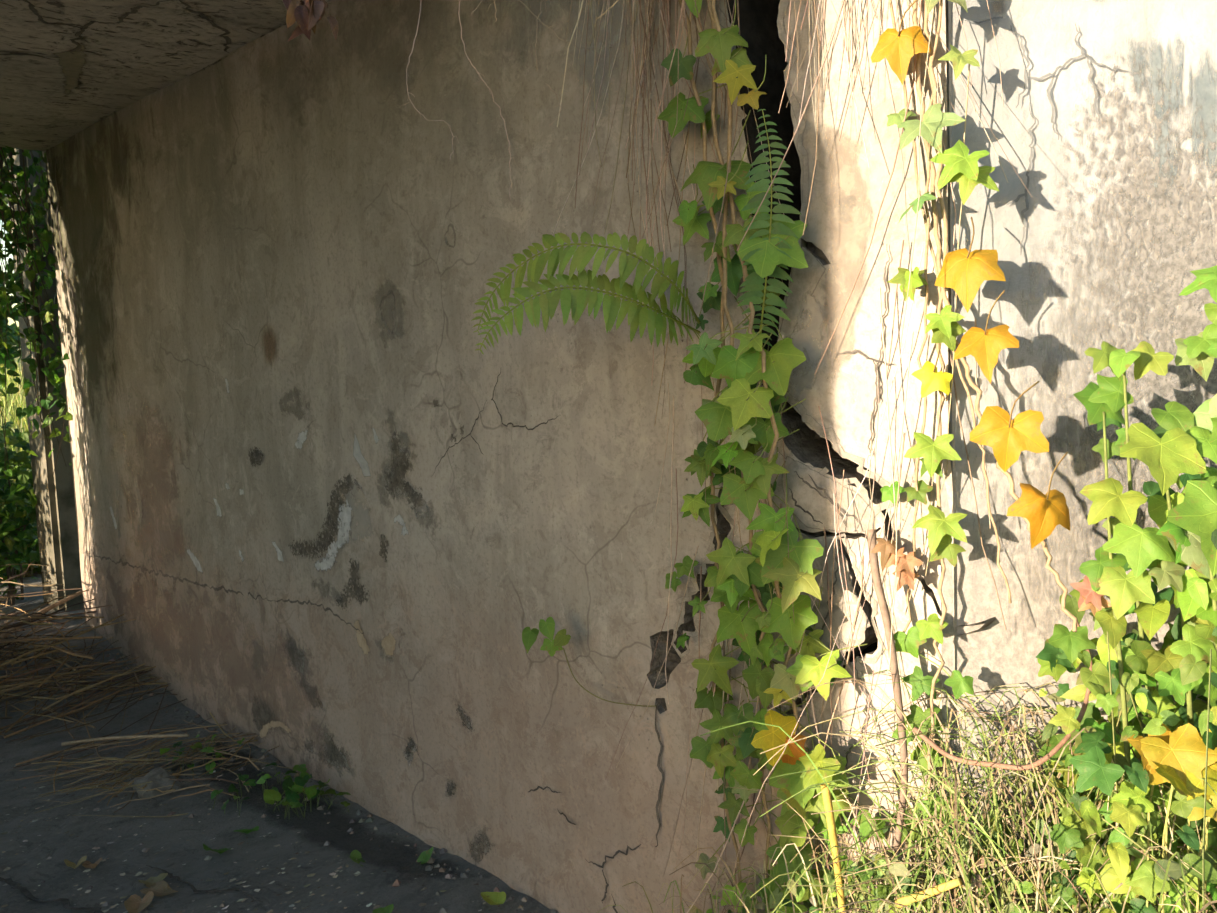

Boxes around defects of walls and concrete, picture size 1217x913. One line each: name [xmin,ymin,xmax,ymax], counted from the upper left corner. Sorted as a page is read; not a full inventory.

crack [715,0,809,238]
crack [965,16,1128,252]
crack [51,155,94,521]
crack [83,552,363,634]
crack [431,372,561,477]
spalling [647,629,689,714]
crack [671,459,738,658]
crack [739,265,792,351]
crack [756,249,996,770]
crack [0,877,104,913]
crack [528,786,576,825]
crack [585,704,664,913]